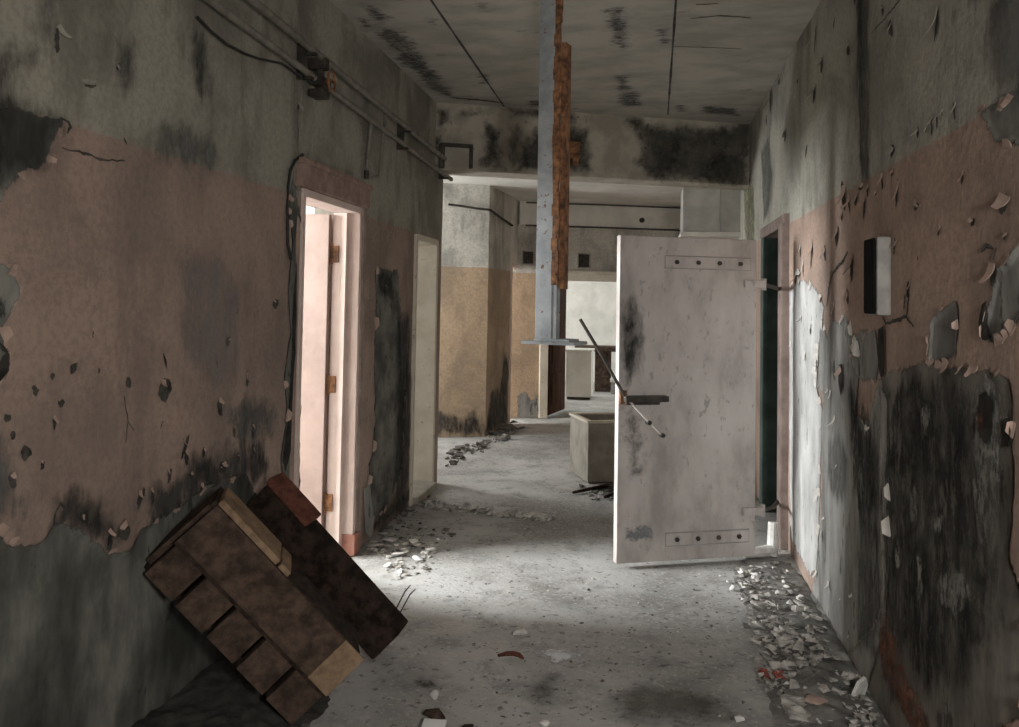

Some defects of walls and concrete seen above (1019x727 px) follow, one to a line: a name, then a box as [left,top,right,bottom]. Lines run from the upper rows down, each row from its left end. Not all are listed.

leakage [0,56,54,184]
peeling [0,107,63,201]
leakage [511,133,538,170]
leakage [615,75,750,185]
leakage [856,0,869,181]
peeling [0,264,20,384]
spalling [4,414,45,470]
spalling [159,353,172,402]
crack [883,294,914,327]
peeling [789,145,1019,727]
peeling [0,436,259,727]
leakage [850,373,1007,727]